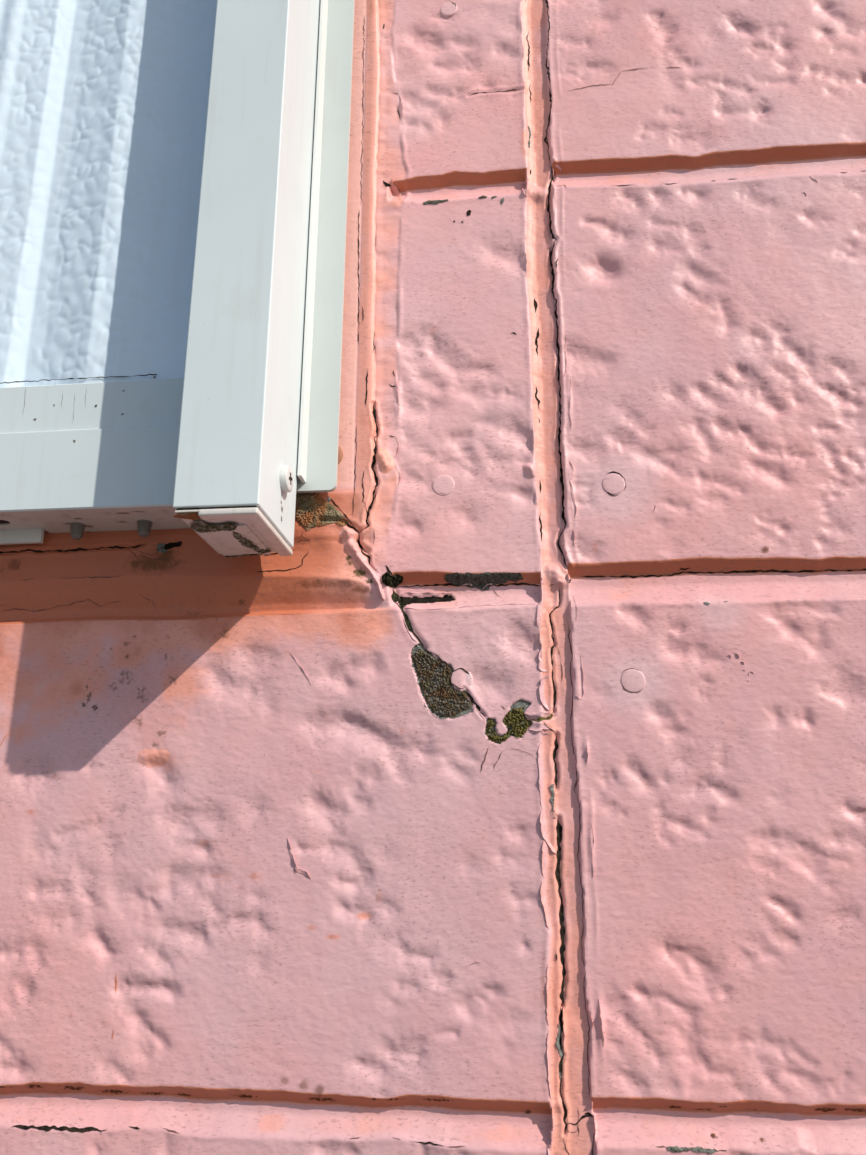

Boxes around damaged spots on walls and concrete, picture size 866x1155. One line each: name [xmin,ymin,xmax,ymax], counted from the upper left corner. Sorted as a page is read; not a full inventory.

crack [0,544,172,612]
peeling [399,572,543,627]
crack [391,0,866,1155]
crack [11,1125,177,1133]